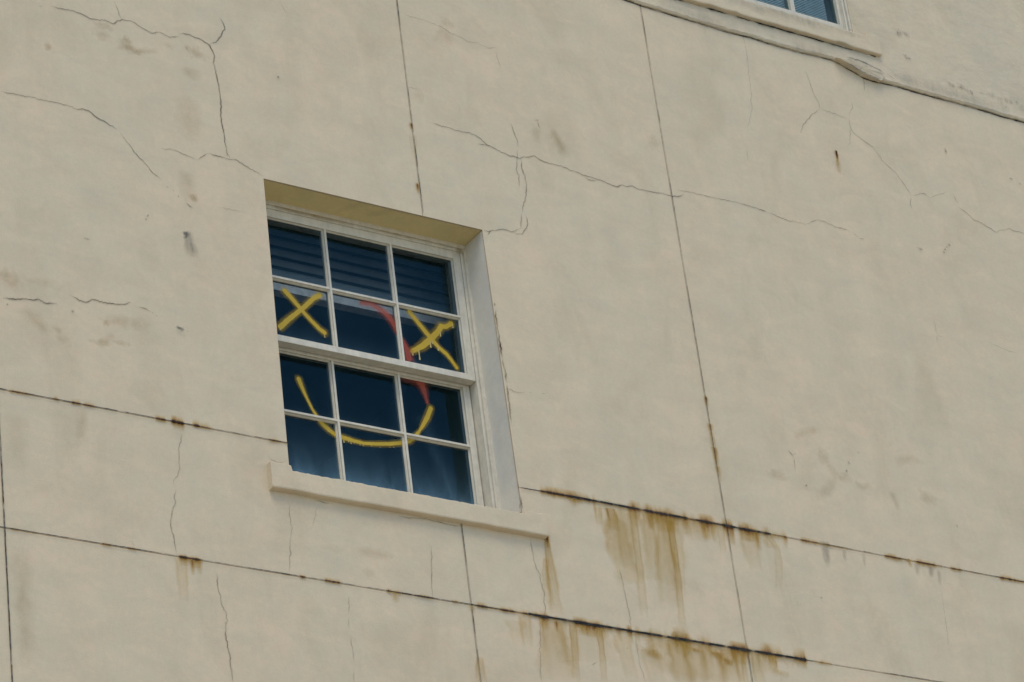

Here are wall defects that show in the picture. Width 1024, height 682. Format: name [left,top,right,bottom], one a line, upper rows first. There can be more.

crack [60,8,256,172]
rust [156,417,210,429]
rust [628,504,787,540]
rust [573,619,807,663]